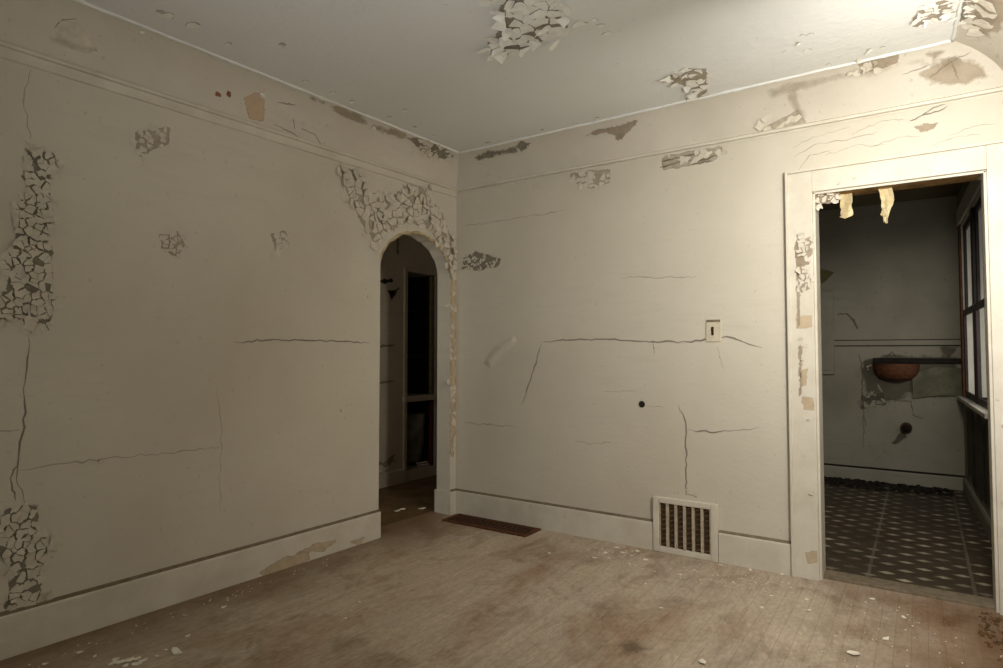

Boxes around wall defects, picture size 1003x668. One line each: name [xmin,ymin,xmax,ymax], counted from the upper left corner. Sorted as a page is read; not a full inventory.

peeling [474,0,587,64]
peeling [911,0,997,42]
peeling [659,68,716,101]
flaking render [921,52,985,84]
peeling [130,123,170,166]
peeling [656,147,728,170]
peeling [878,187,894,223]
peeling [0,136,64,341]
peeling [794,233,834,293]
peeling [336,162,501,456]
peeling [0,503,59,611]